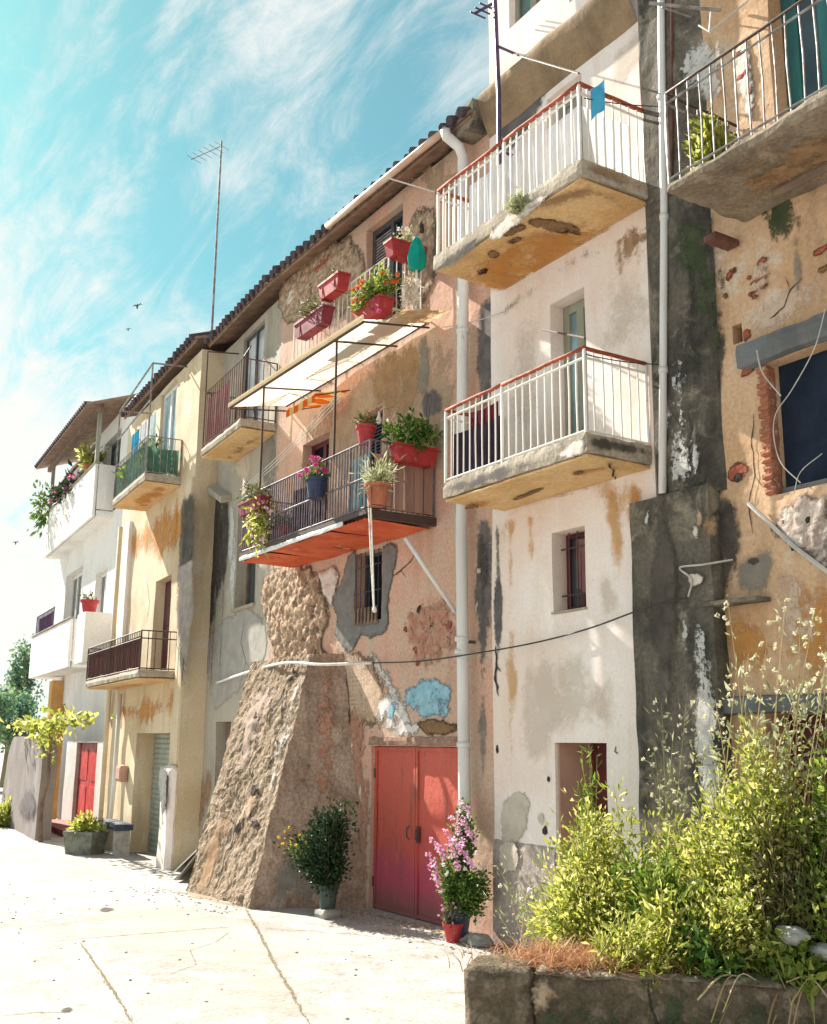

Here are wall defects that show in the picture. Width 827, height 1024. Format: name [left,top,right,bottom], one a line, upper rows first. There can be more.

spalling [478,194,581,275]
peeling [723,244,827,342]
damp [762,200,801,290]
crack [771,279,801,318]
damp [667,360,709,481]
damp [704,499,741,591]
peeling [770,492,827,568]
damp [121,495,195,723]
damp [475,521,516,702]
damp [648,517,718,816]
spalling [260,565,457,880]
peeling [499,792,547,873]